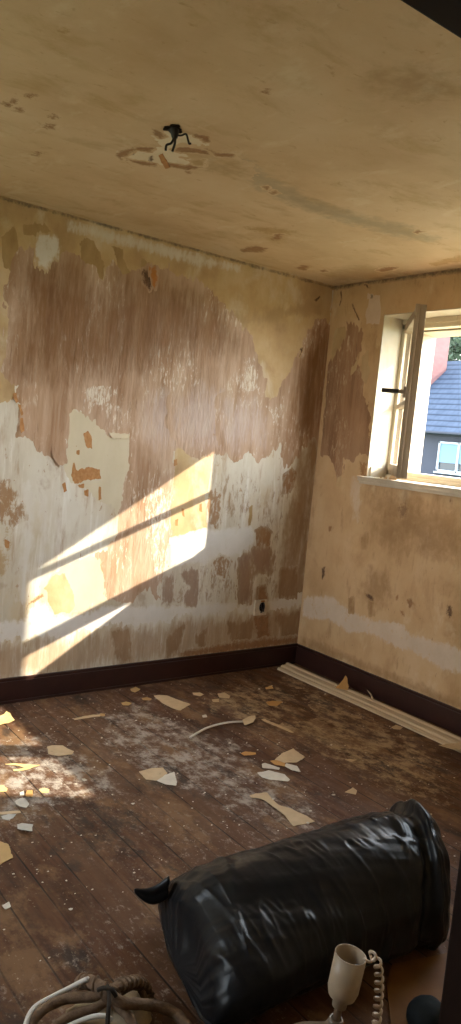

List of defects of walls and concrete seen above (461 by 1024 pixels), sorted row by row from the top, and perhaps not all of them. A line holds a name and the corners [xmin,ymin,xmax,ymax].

peeling [113,127,237,175]
peeling [1,222,51,270]
peeling [79,238,150,280]
peeling [62,353,290,518]
peeling [141,479,185,586]
peeling [25,573,75,615]